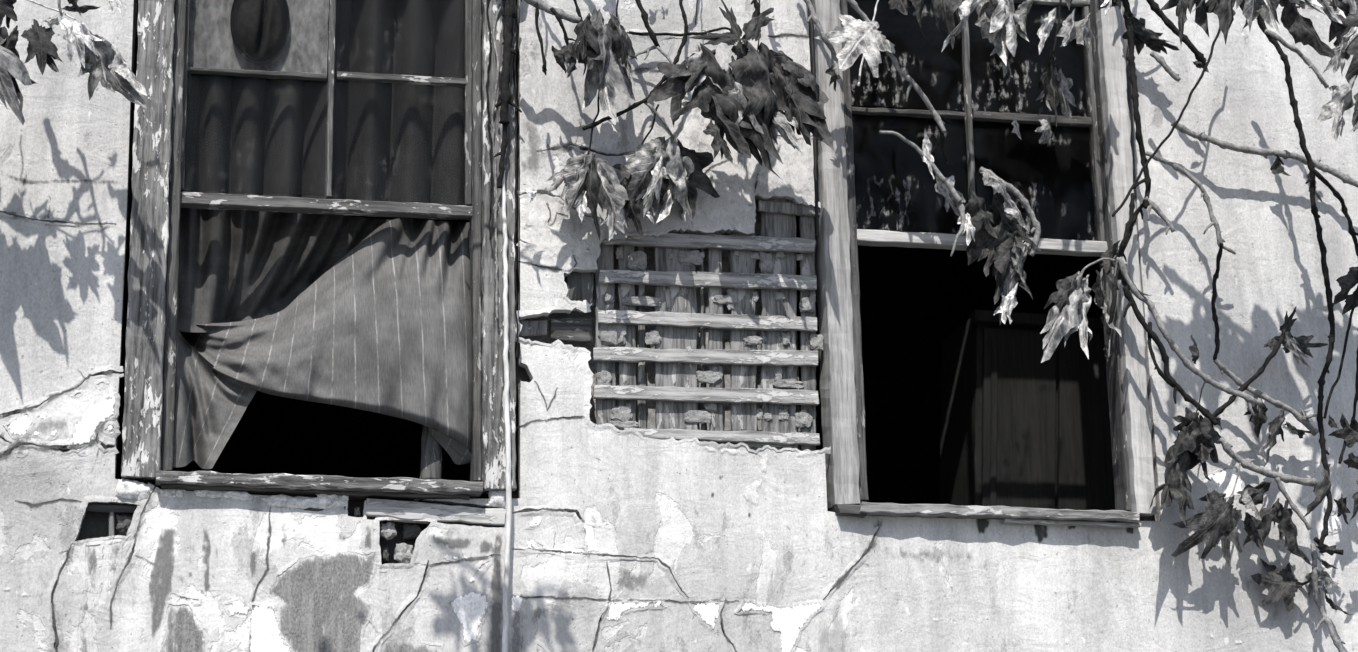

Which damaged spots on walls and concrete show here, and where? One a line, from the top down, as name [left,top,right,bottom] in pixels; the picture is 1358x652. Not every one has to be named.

crack [0,176,116,232]
flaking render [515,114,831,503]
peeling [0,378,120,459]
crack [0,365,124,461]
crack [45,541,75,652]
crack [104,483,159,630]
spalling [70,479,437,569]
peeling [443,553,494,647]
flaking render [487,490,506,508]
crack [366,505,741,652]
peeling [687,599,825,652]
crack [821,522,882,601]